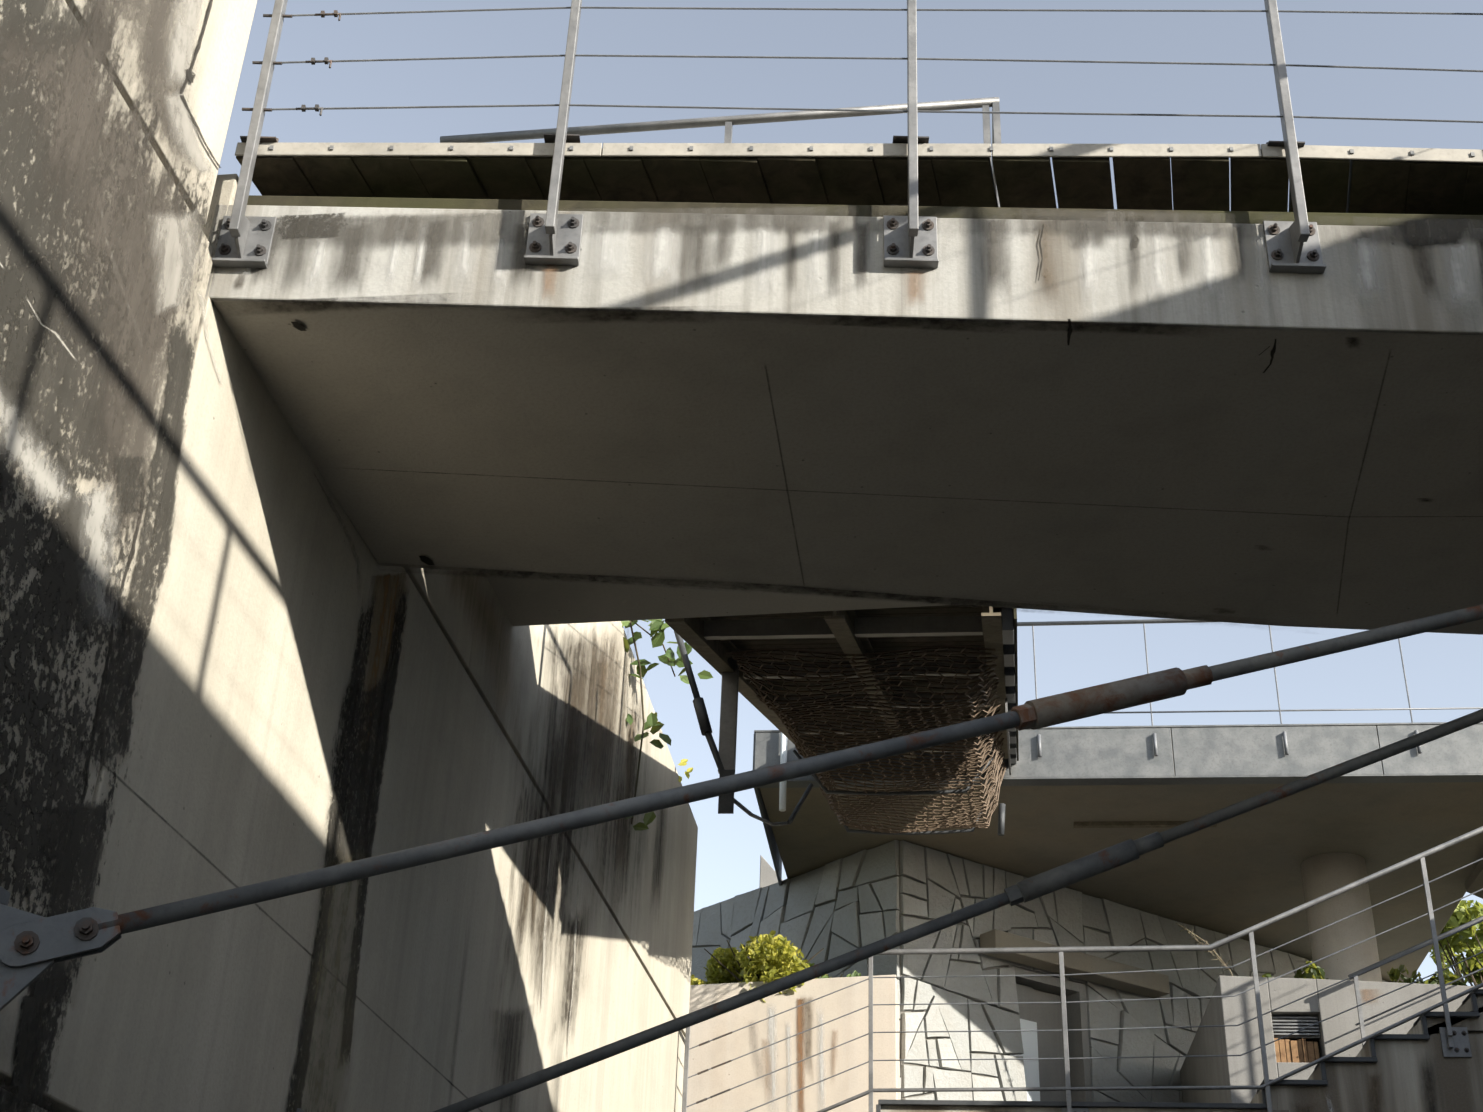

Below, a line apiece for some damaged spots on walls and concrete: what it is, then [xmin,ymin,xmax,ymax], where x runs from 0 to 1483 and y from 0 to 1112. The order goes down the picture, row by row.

leakage [236,213,529,286]
leakage [636,207,867,279]
leakage [1044,210,1263,289]
leakage [265,297,407,312]
leakage [560,307,690,321]
leakage [835,315,968,330]
leakage [1069,322,1180,334]
leakage [0,0,221,917]
leakage [317,479,407,868]
leakage [516,637,641,1045]
leakage [287,877,368,1112]
leakage [0,957,82,1112]